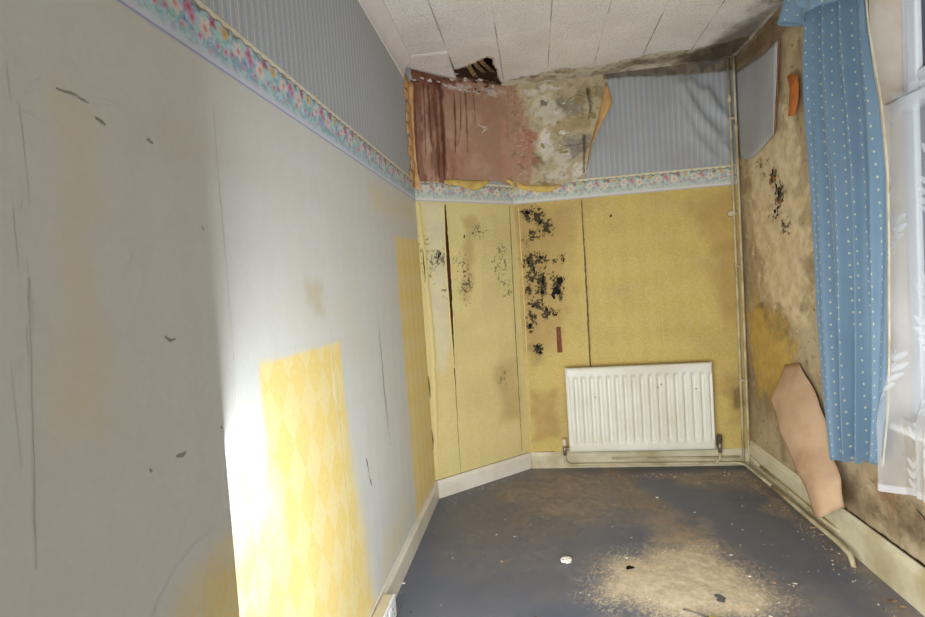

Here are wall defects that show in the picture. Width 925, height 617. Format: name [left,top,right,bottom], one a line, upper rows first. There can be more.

water stain [603,0,787,79]
flaking render [404,61,608,190]
mould [756,159,791,236]
water stain [485,200,588,447]
water stain [150,172,487,617]